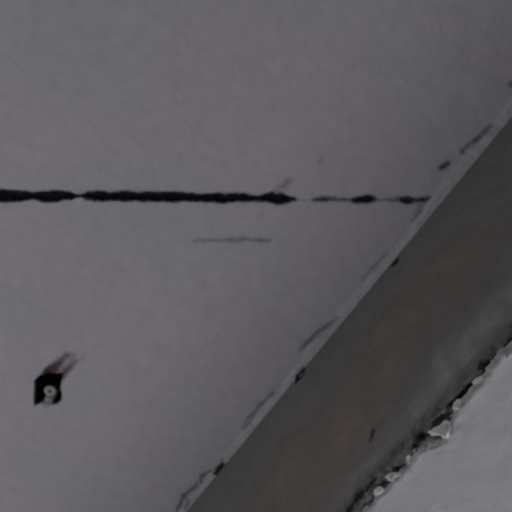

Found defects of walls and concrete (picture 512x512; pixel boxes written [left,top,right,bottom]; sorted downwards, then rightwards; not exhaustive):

crack [0,189,296,205]
crack [352,195,374,203]
crack [395,196,423,204]
spalling [342,324,512,512]